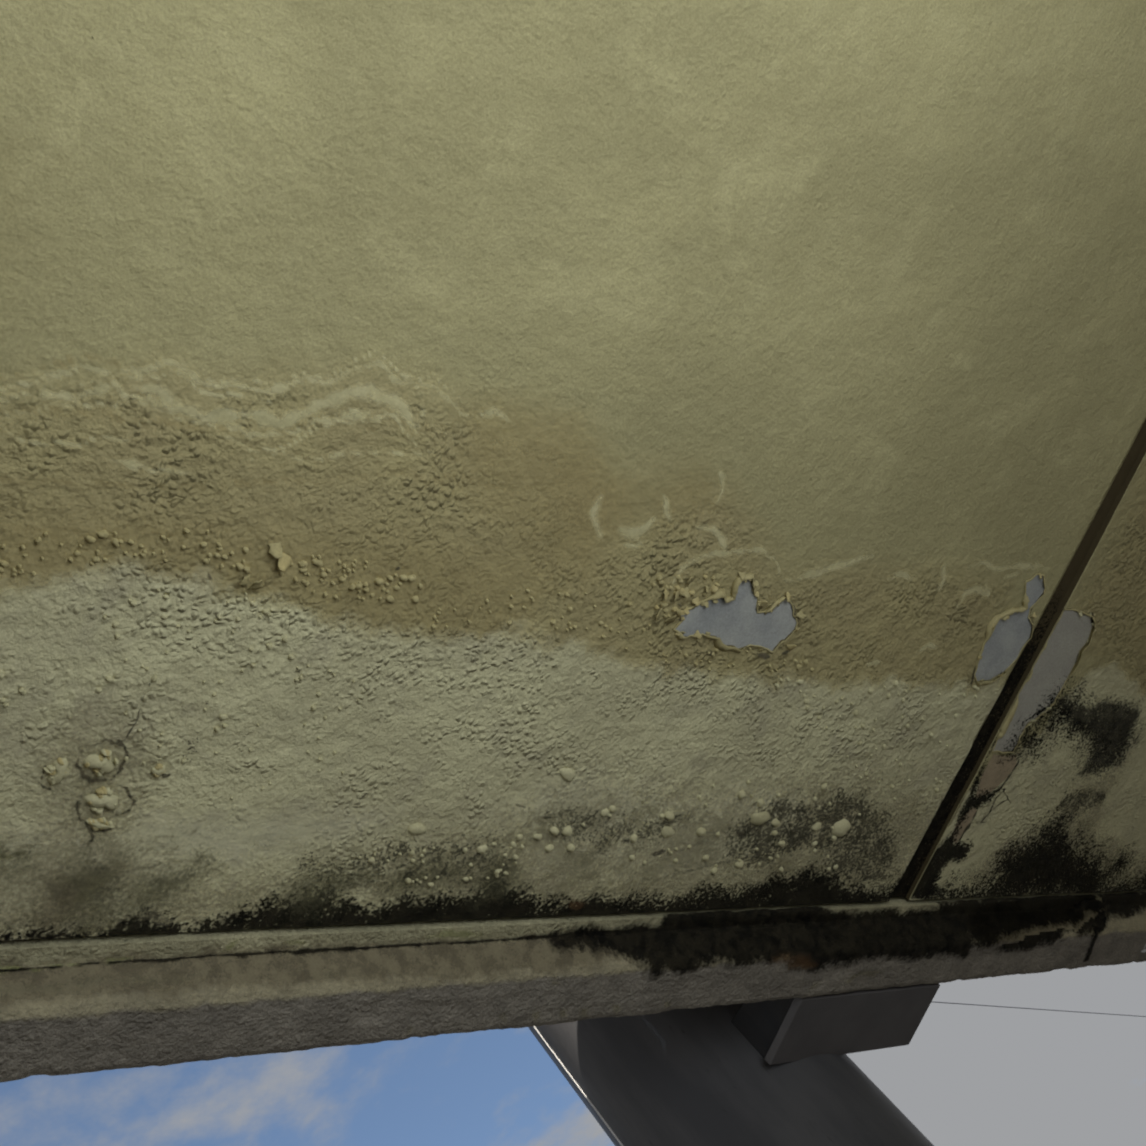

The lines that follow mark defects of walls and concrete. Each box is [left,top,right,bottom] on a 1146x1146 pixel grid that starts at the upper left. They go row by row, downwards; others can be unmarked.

damp [0,360,1146,980]
peeling [656,572,806,659]
peeling [971,573,1046,686]
peeling [953,608,1096,843]